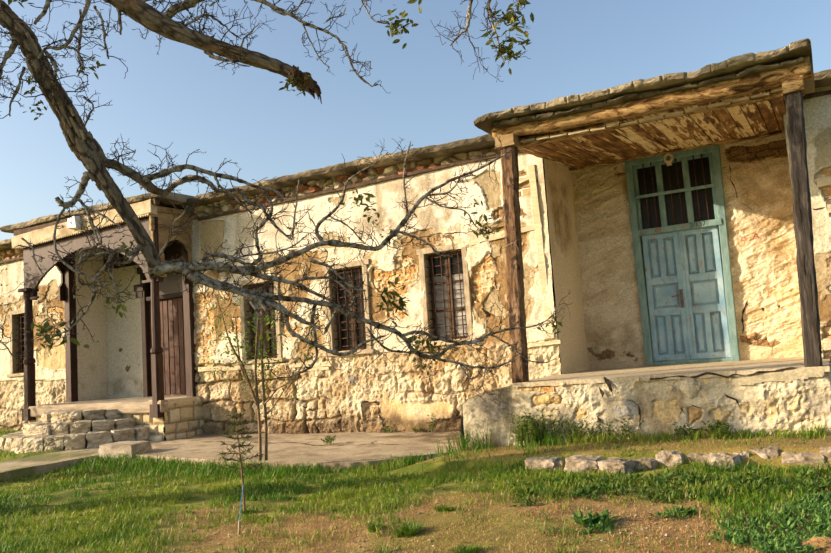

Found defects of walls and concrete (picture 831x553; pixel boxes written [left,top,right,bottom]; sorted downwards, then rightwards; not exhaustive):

flaking render [725,139,788,164]
flaking render [811,127,831,215]
flaking render [369,254,419,294]
flaking render [469,252,508,319]
flaking render [385,307,407,319]
flaking render [740,333,781,347]
flaking render [820,321,831,338]
flaking render [587,348,638,362]